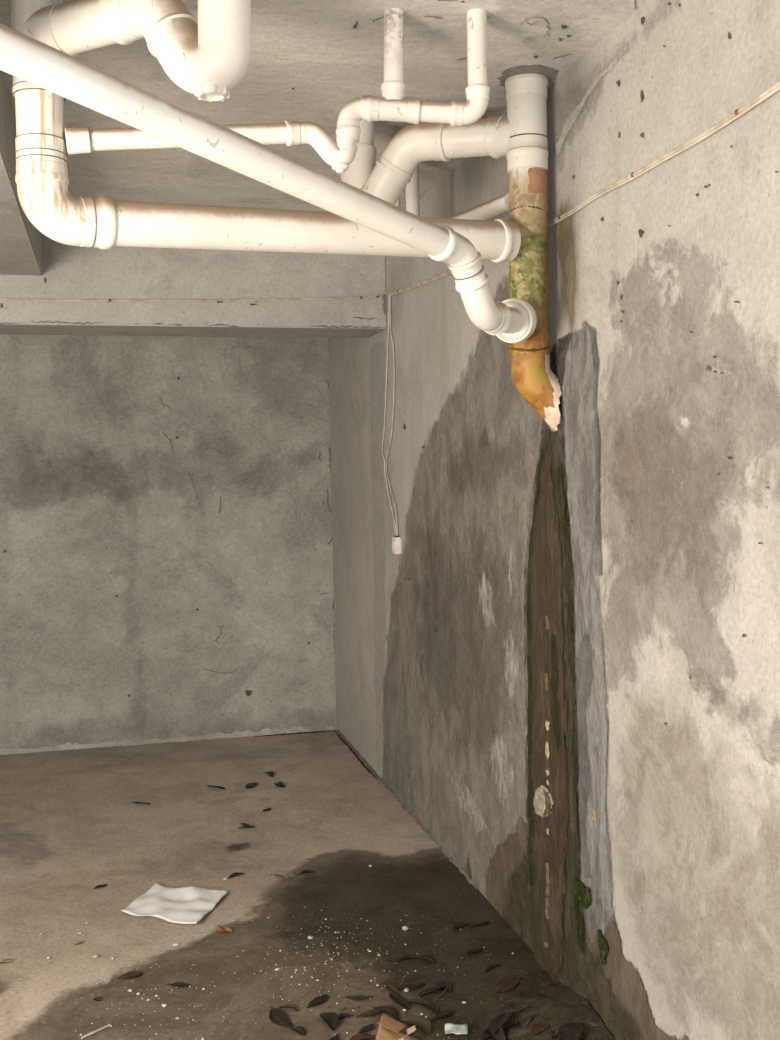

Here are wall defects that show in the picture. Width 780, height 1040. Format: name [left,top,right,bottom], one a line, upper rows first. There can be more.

crack [520,17,572,60]
damp [13,240,780,1040]